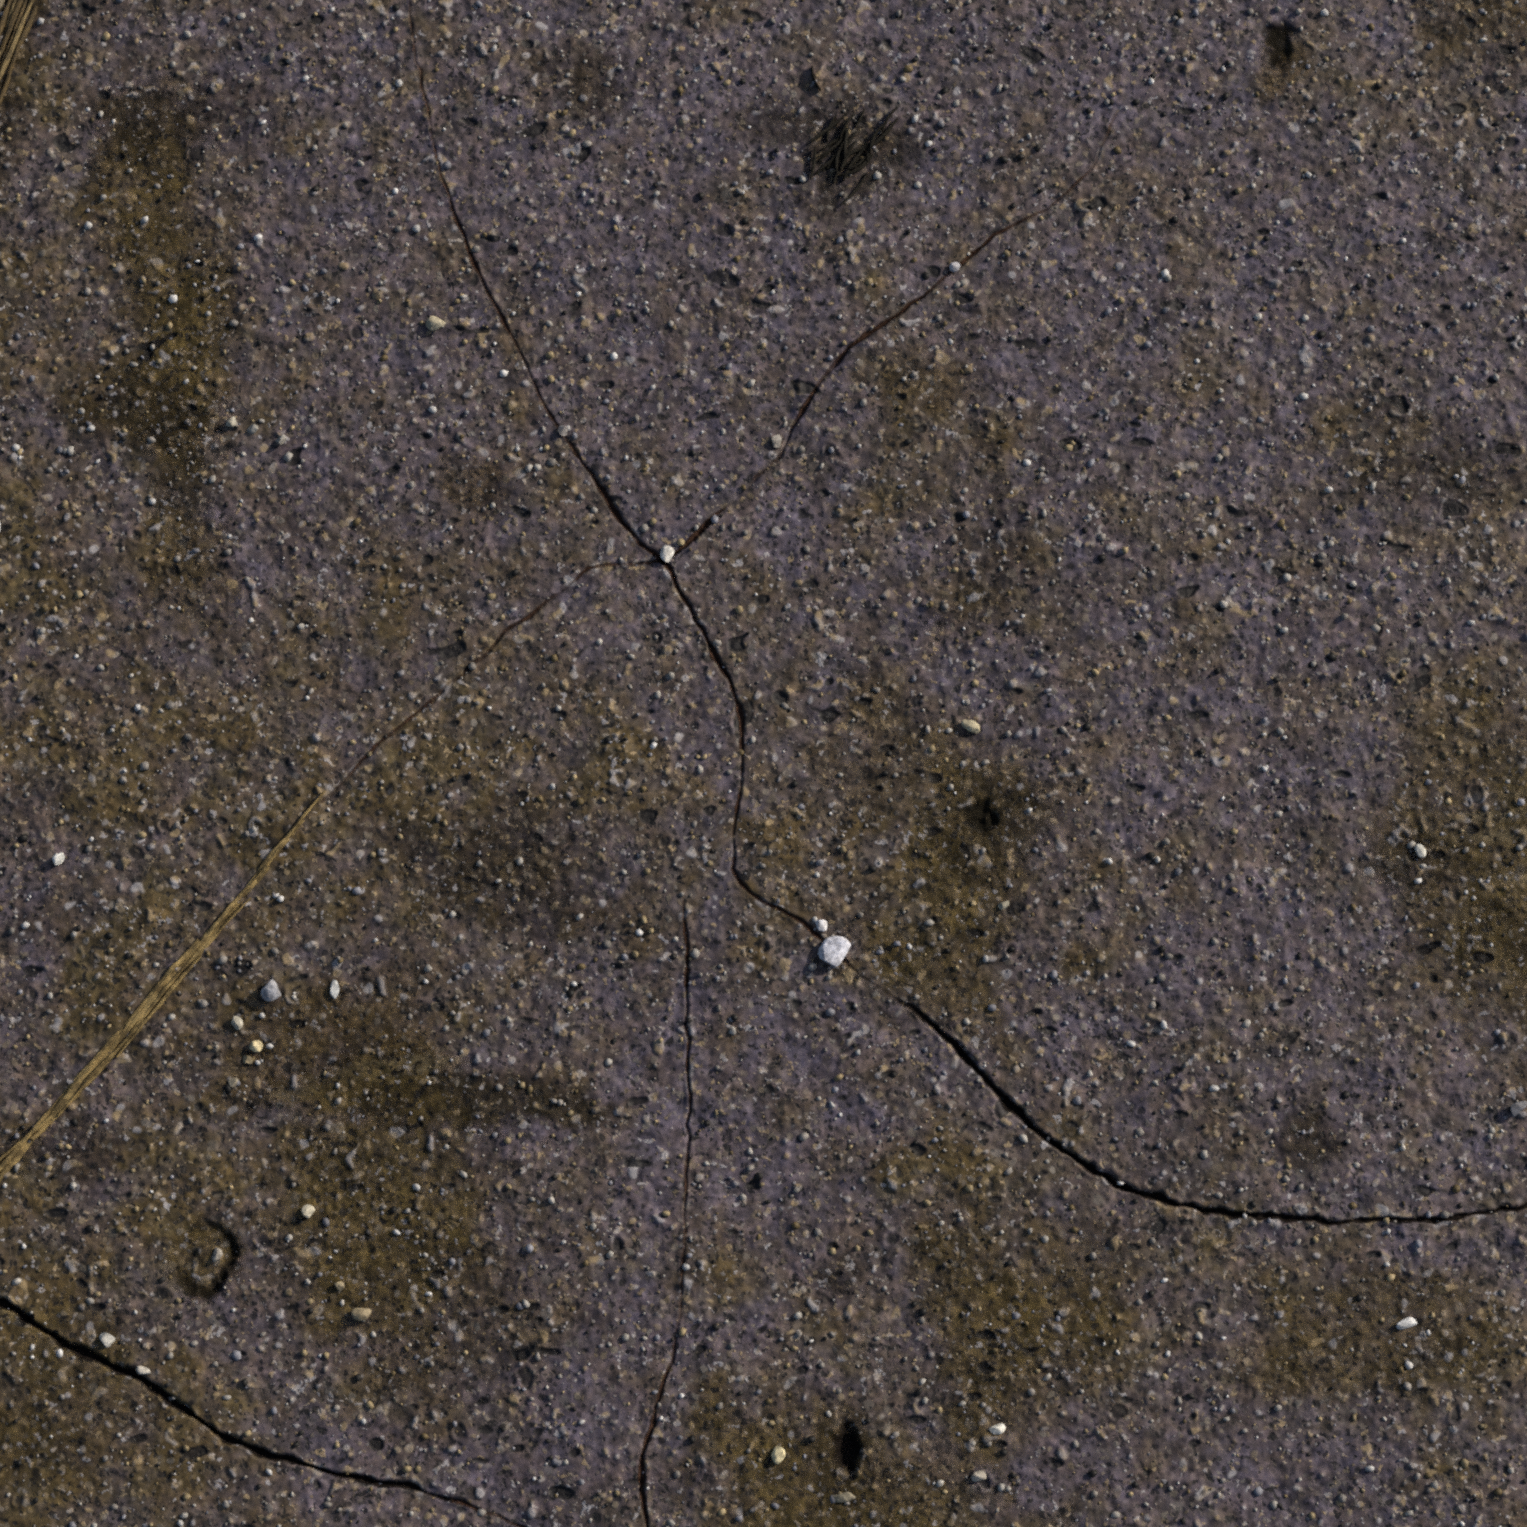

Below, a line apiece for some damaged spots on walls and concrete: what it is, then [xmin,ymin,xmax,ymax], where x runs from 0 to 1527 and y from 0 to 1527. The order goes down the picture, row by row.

crack [409,0,744,749]
crack [794,171,1090,425]
crack [322,686,446,802]
crack [731,788,1527,1226]
crack [0,1298,525,1527]